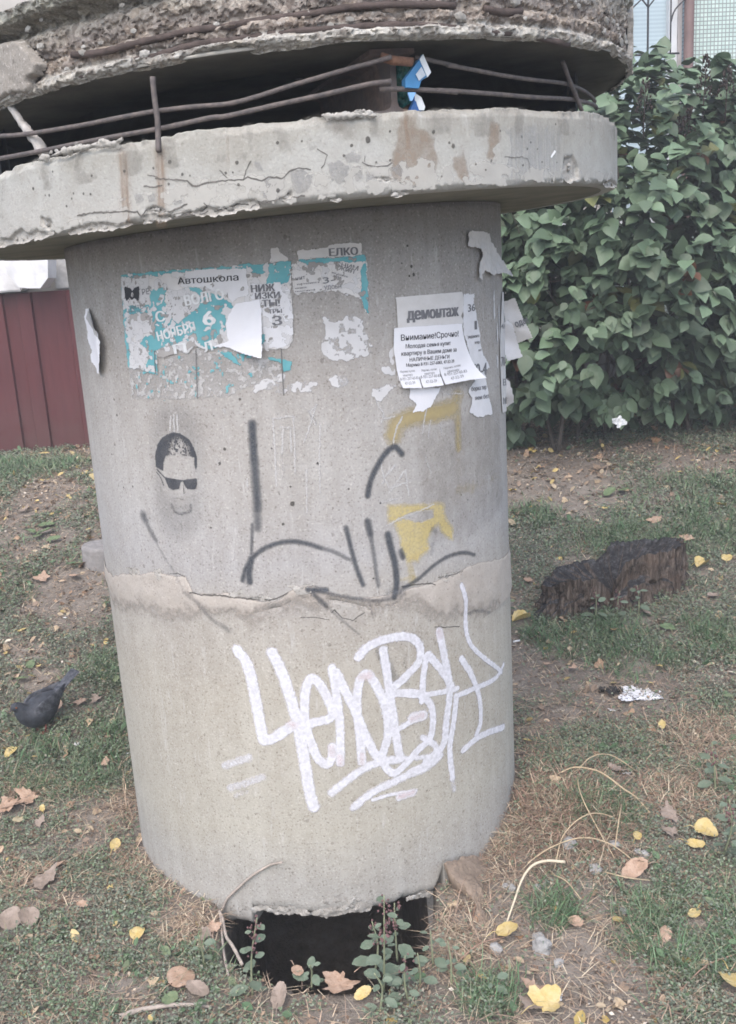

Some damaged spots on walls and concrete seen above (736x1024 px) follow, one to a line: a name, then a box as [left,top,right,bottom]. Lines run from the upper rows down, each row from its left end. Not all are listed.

spalling [0,0,634,110]
peeling [0,161,296,248]
crack [77,149,327,223]
peeling [305,136,618,202]
crack [170,573,288,601]
crack [301,609,365,621]
spalling [230,894,374,919]